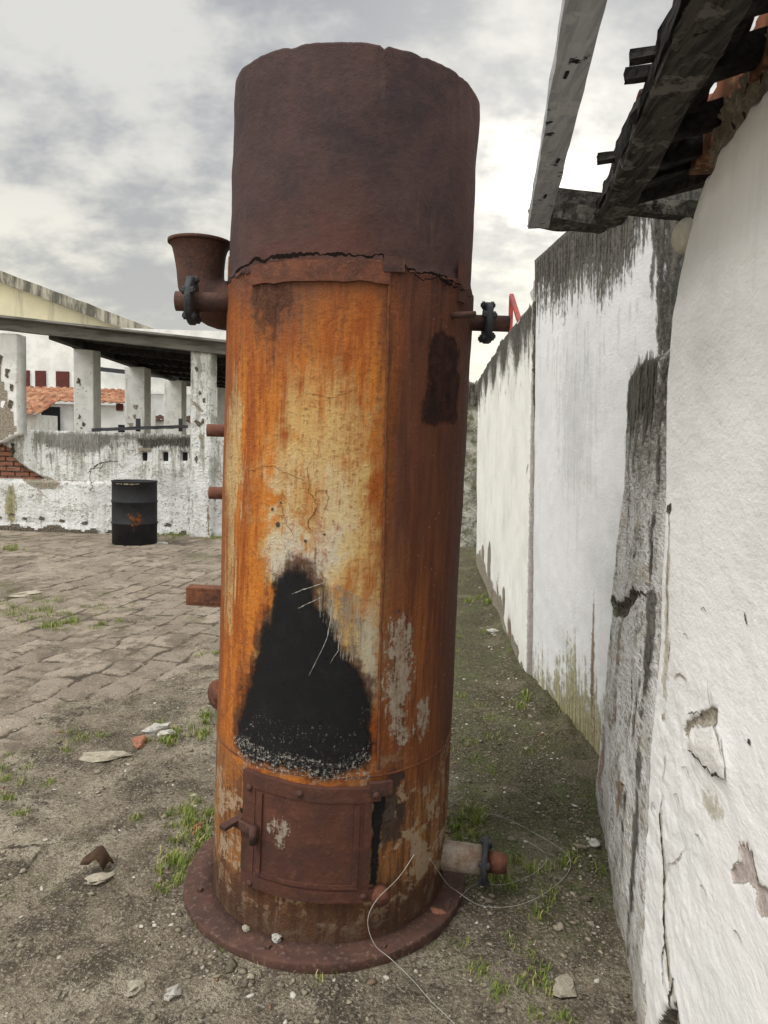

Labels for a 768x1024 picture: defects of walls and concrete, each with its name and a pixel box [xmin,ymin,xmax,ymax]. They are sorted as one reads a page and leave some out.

leakage [661,188,703,201]
peeling [0,355,60,497]
leakage [32,431,190,469]
leakage [468,216,685,957]
peeling [682,681,724,779]
peeling [731,842,768,917]